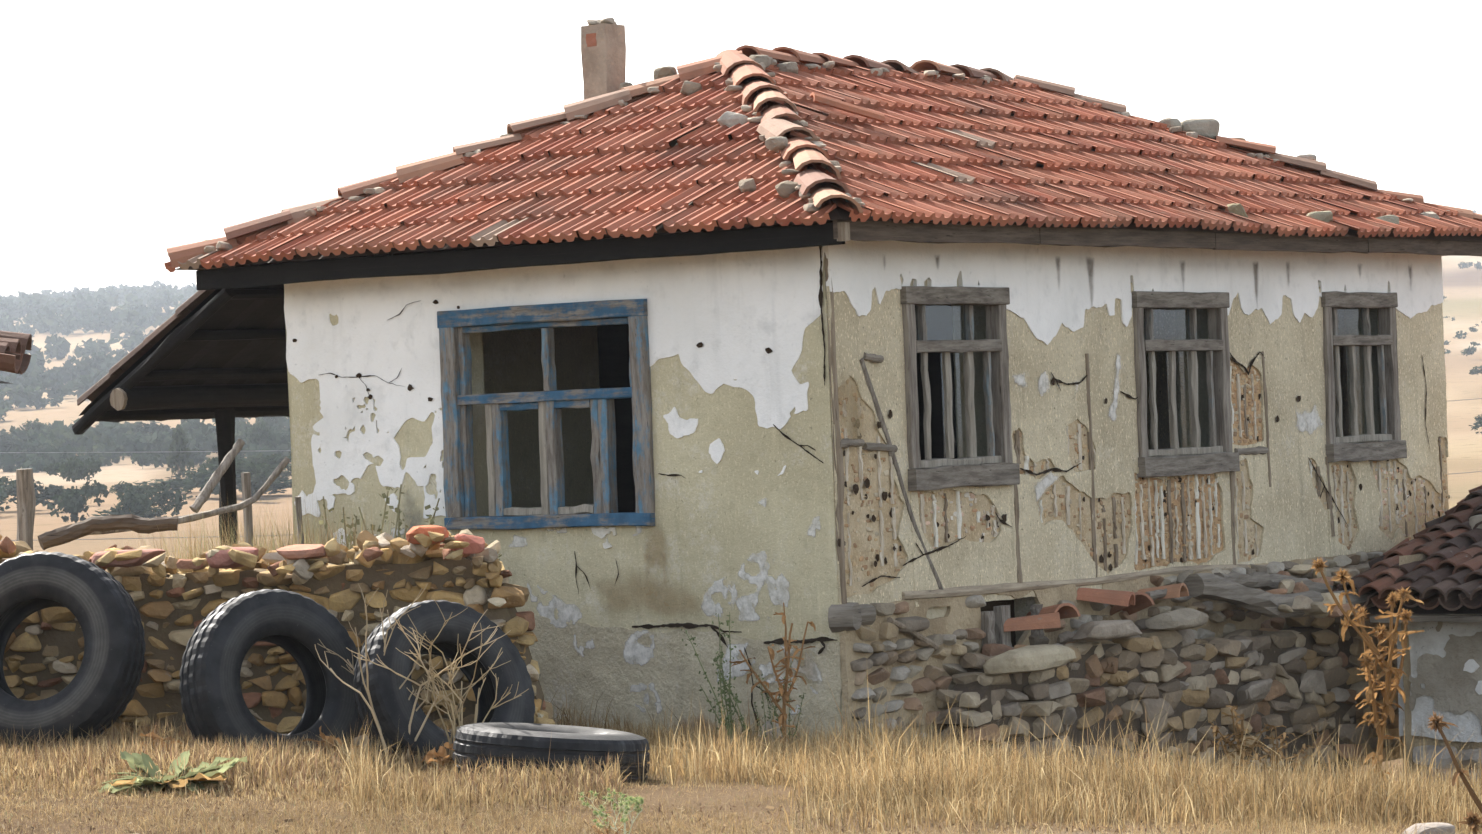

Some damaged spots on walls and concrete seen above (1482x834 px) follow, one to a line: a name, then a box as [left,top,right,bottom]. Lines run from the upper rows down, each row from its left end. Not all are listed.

peeling [288,277,1450,743]
flaking render [1403,622,1482,735]